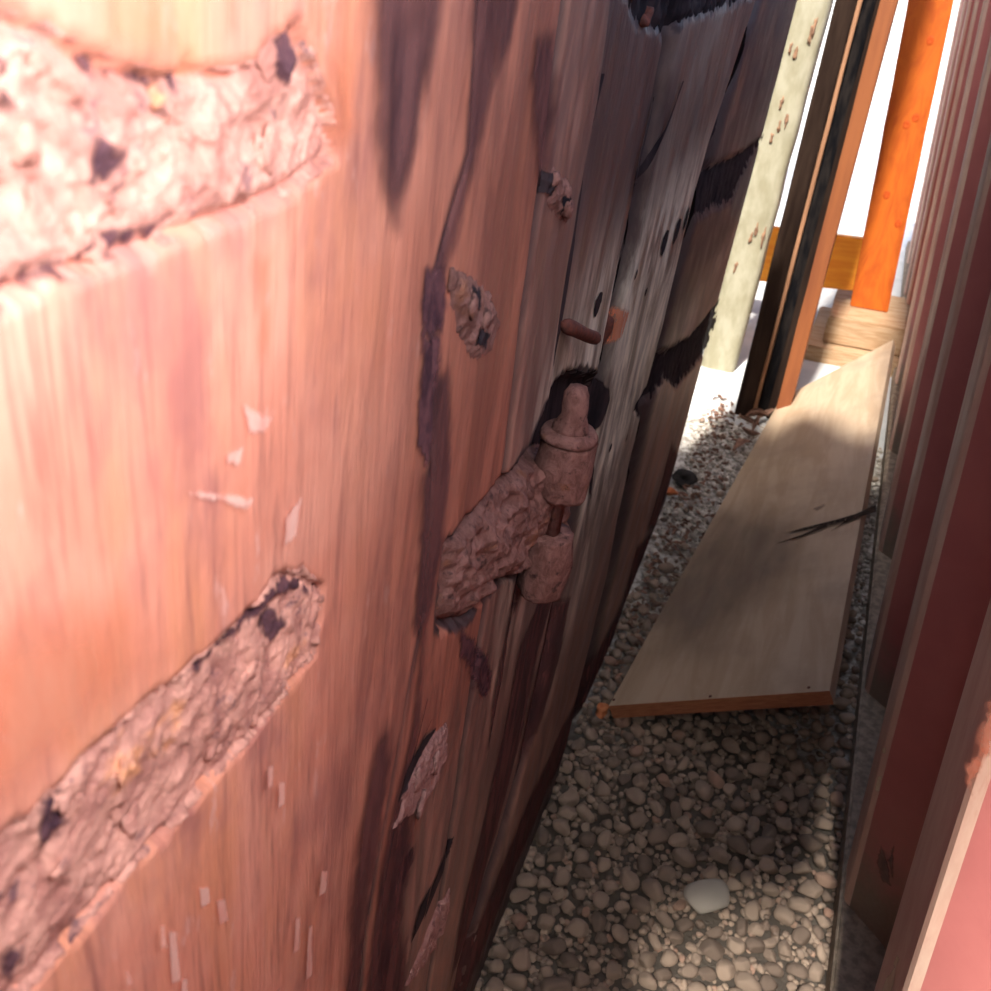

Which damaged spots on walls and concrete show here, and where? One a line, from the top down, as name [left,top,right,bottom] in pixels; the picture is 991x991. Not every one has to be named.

spalling [628,0,746,32]
spalling [0,8,337,288]
rust [607,308,629,341]
spalling [0,565,324,991]
peeling [967,705,991,783]
peeling [319,872,327,896]